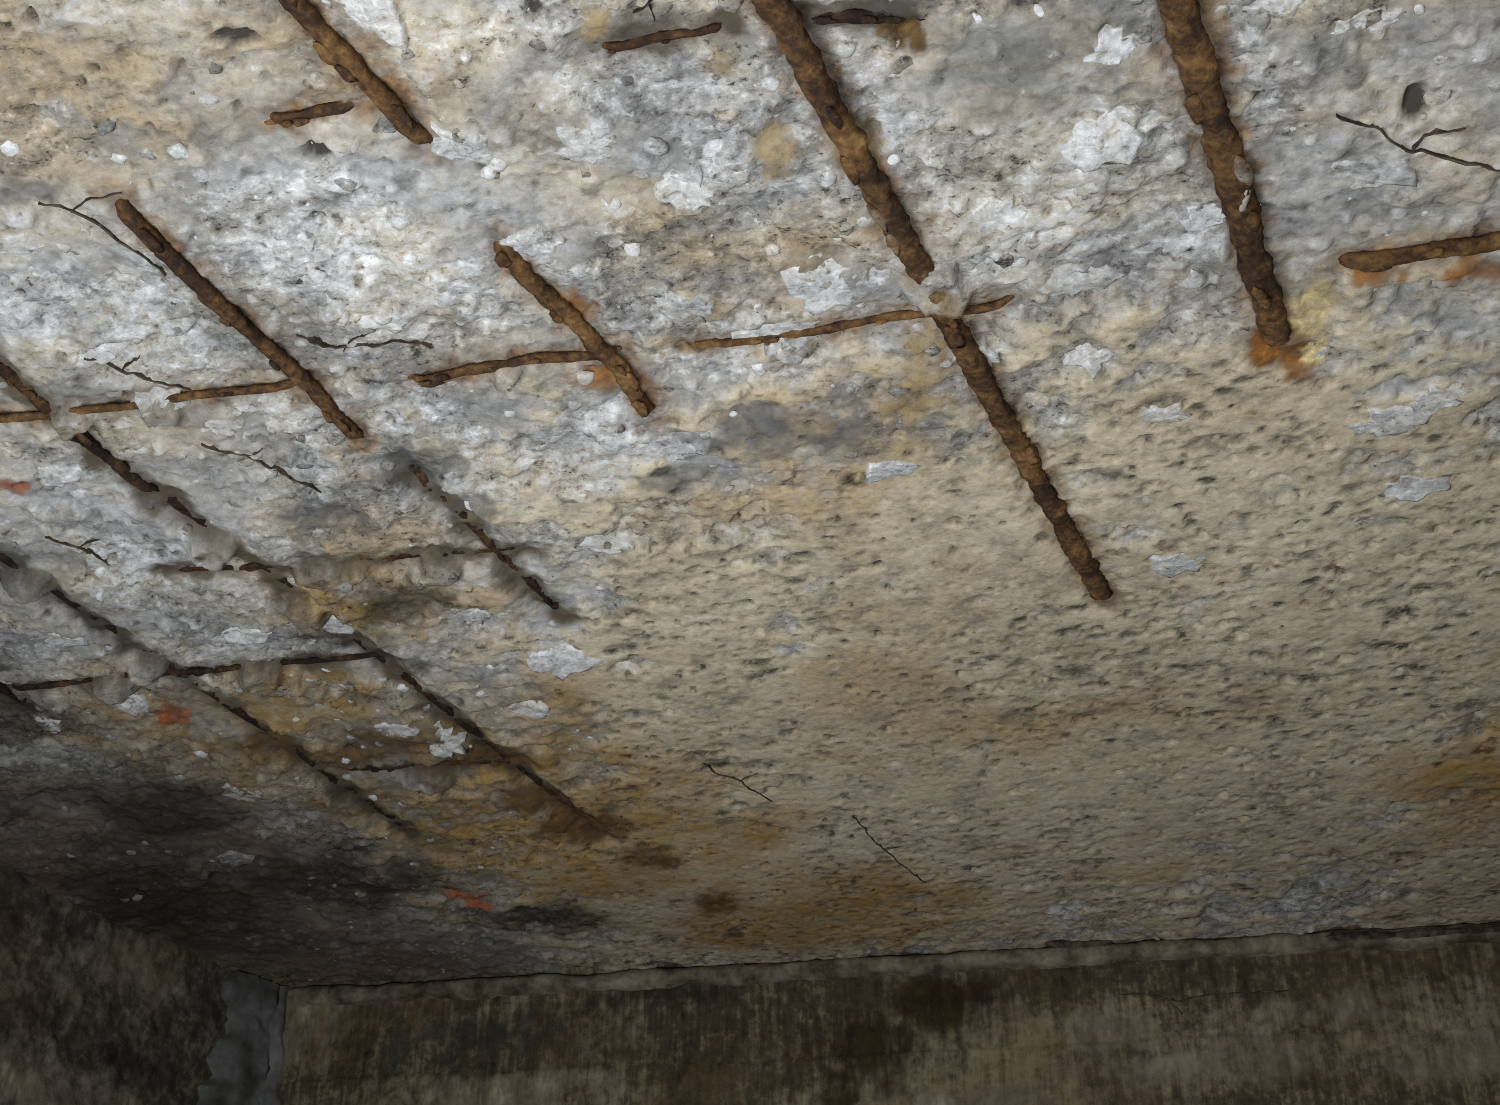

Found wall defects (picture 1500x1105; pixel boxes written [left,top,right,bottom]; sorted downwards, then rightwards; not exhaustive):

corrosion [877,16,925,51]
crack [1336,113,1500,172]
spalling [261,0,1500,600]
corrosion [1351,268,1405,287]
corrosion [1444,256,1500,281]
corrosion [1249,329,1316,379]
spalling [0,0,635,983]
leakage [0,694,71,743]
leakage [76,837,441,936]
leakage [478,907,600,936]
spalling [1195,859,1397,936]
leakage [820,980,992,1105]